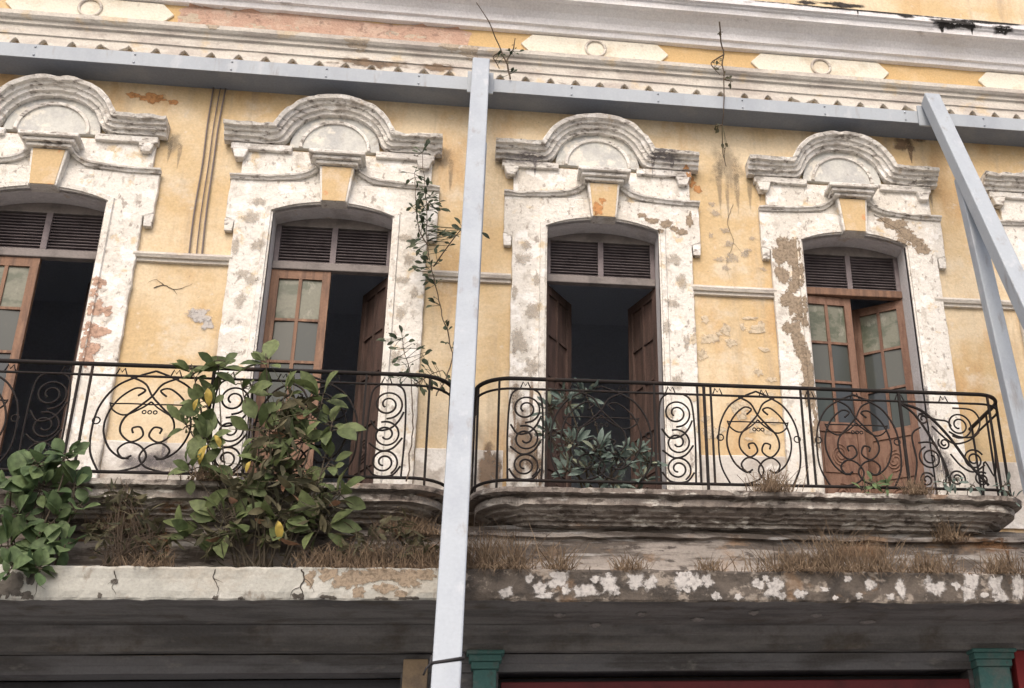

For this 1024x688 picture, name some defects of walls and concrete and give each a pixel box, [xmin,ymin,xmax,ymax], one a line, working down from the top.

peeling [126,92,178,105]
peeling [876,217,932,254]
peeling [78,276,113,368]
peeling [772,236,821,456]
peeling [696,416,727,439]
peeling [727,400,779,441]
crack [291,569,313,600]
peeling [292,568,437,600]
peeling [674,571,744,601]
peeling [752,575,808,601]
peeling [856,579,906,600]
peeling [924,573,1024,602]